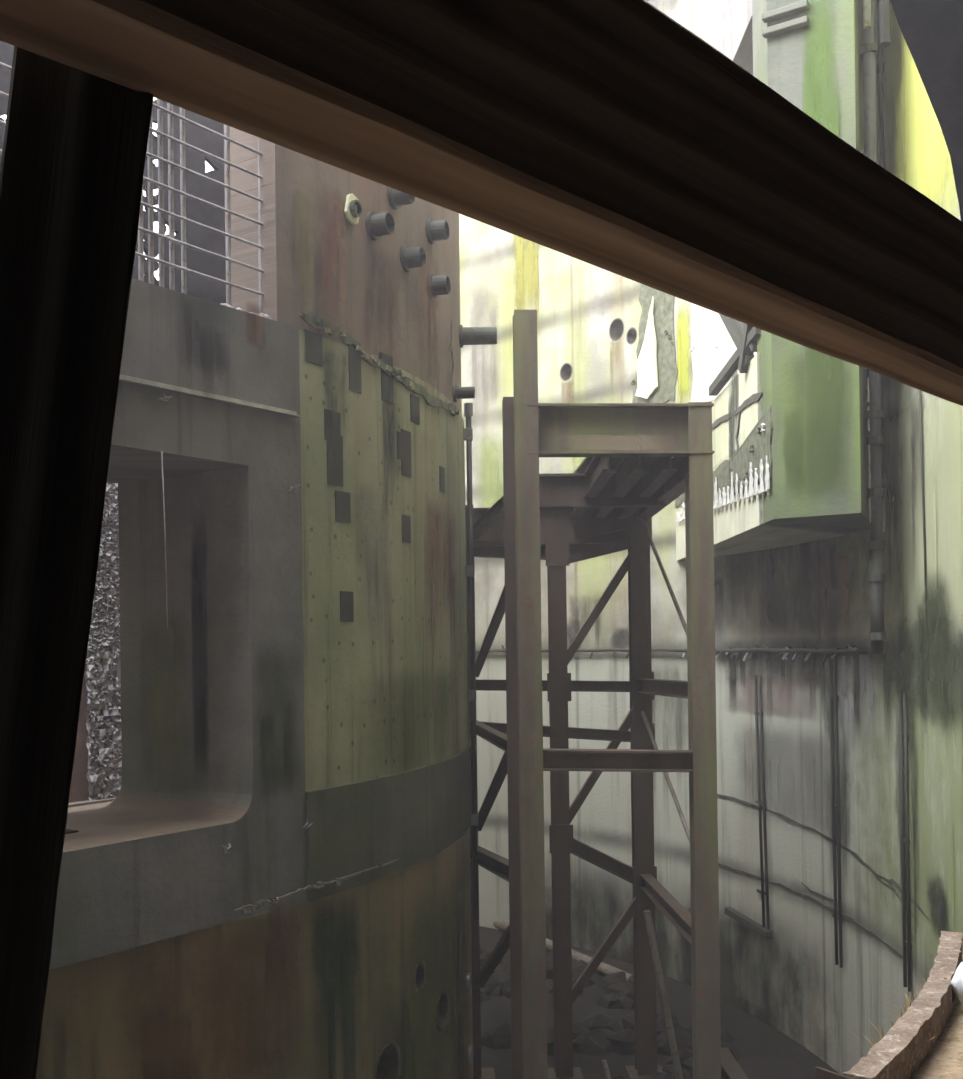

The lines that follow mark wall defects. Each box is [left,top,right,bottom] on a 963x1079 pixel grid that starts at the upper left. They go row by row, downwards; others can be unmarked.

leakage [804,83,839,137]
leakage [730,640,889,849]
crack [718,863,903,957]
crack [717,794,929,920]
leakage [897,720,917,928]